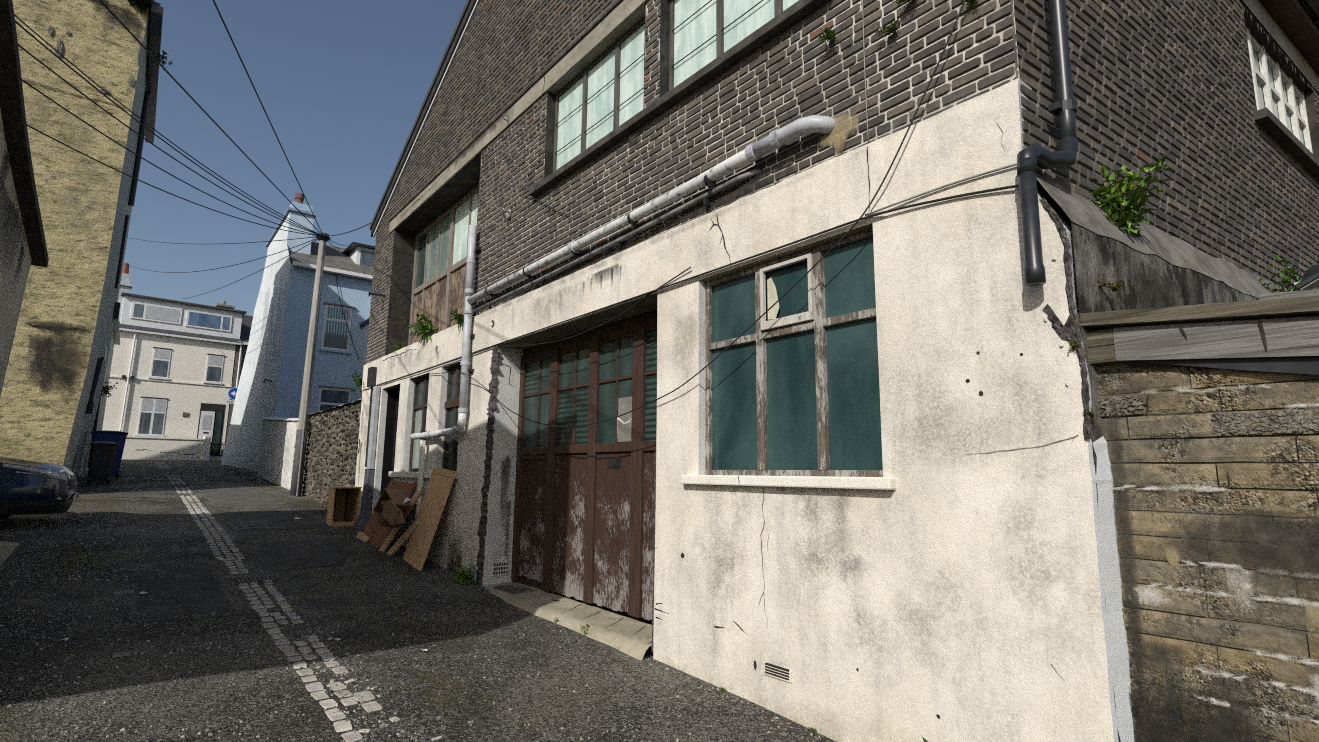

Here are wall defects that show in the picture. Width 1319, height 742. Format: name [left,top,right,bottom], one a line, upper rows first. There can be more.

crack [708,214,730,259]
water stain [28,321,89,400]
spalling [1039,198,1144,439]
crack [738,476,769,620]
water stain [1113,446,1319,742]